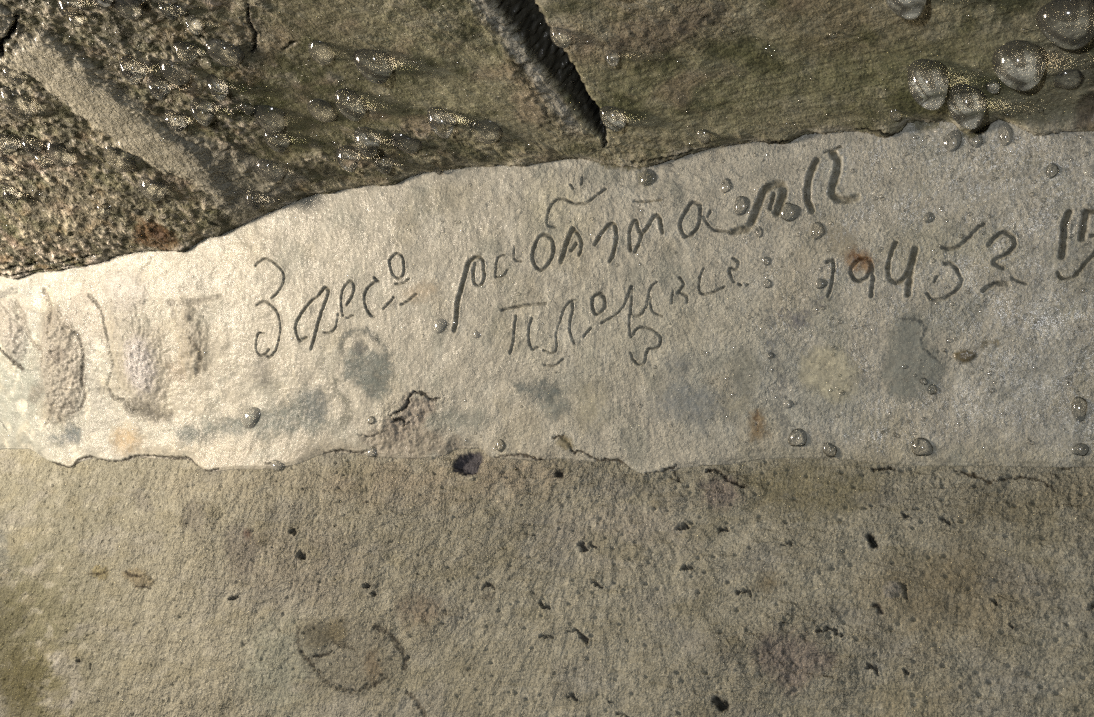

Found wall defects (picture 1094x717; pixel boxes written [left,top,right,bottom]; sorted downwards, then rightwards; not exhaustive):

crack [473,0,607,146]
crack [632,147,703,163]
crack [759,138,789,146]
crack [862,128,895,137]
water stain [124,338,172,421]
water stain [176,390,325,440]
water stain [333,329,391,424]
water stain [883,317,943,398]